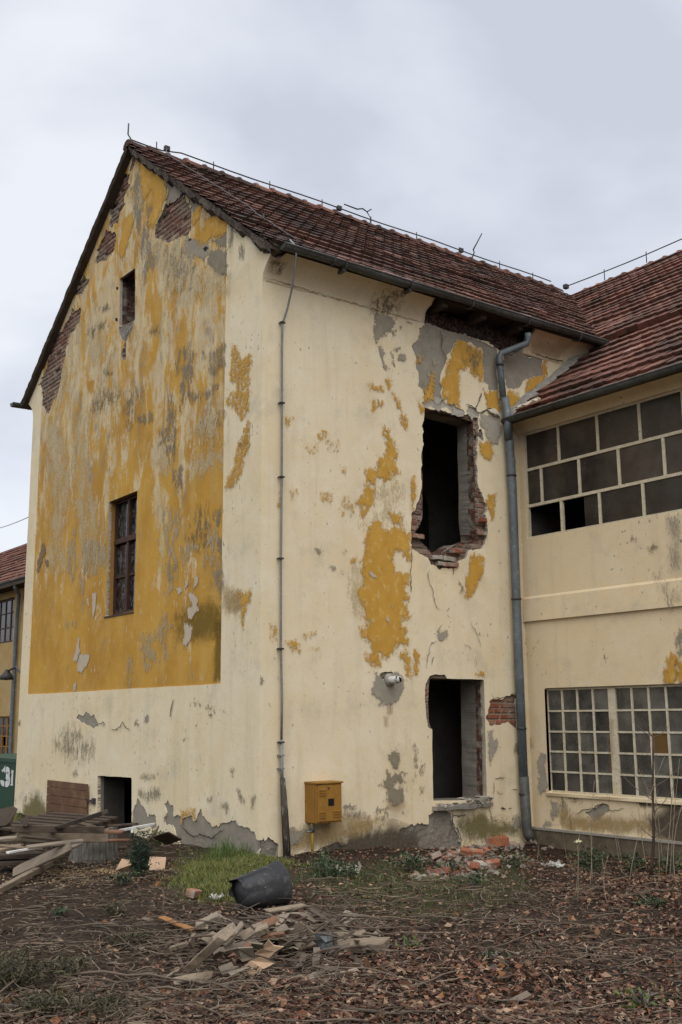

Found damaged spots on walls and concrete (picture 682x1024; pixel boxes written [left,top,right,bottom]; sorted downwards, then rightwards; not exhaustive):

flaking render [97,162,227,276]
flaking render [40,309,81,414]
flaking render [115,318,133,360]
peeling [159,343,252,490]
peeling [36,542,49,573]
peeling [66,522,107,692]
peeling [127,505,222,686]
peeling [319,313,548,706]
flaking render [486,695,516,766]
flaking render [132,799,277,857]
flaking render [344,746,406,821]
flaking render [586,804,609,821]